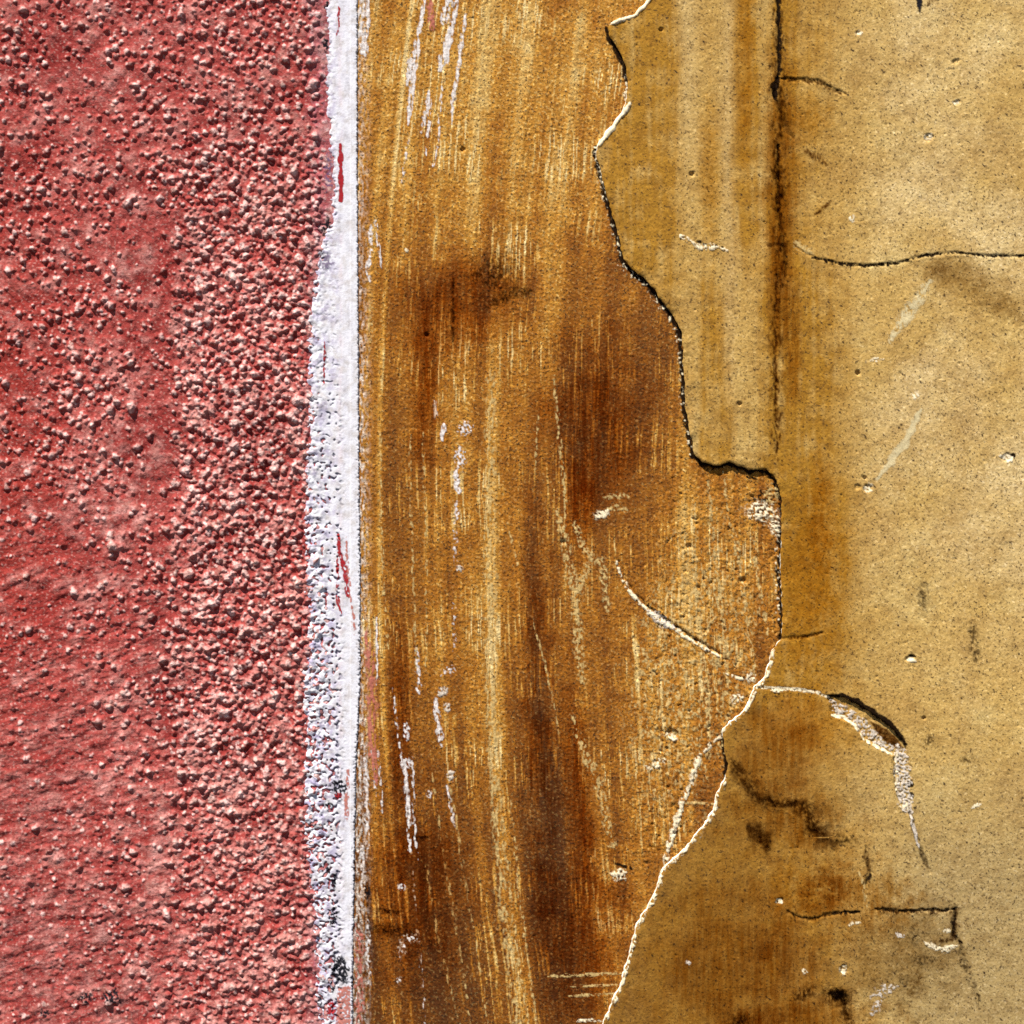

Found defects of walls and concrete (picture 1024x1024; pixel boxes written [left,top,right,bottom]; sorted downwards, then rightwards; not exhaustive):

crack [768,241,1024,268]
flaking render [595,494,629,518]
crack [592,0,829,1019]
flaking render [631,471,780,817]
flaking render [827,693,925,861]
flaking render [611,863,633,882]
crack [793,850,966,968]